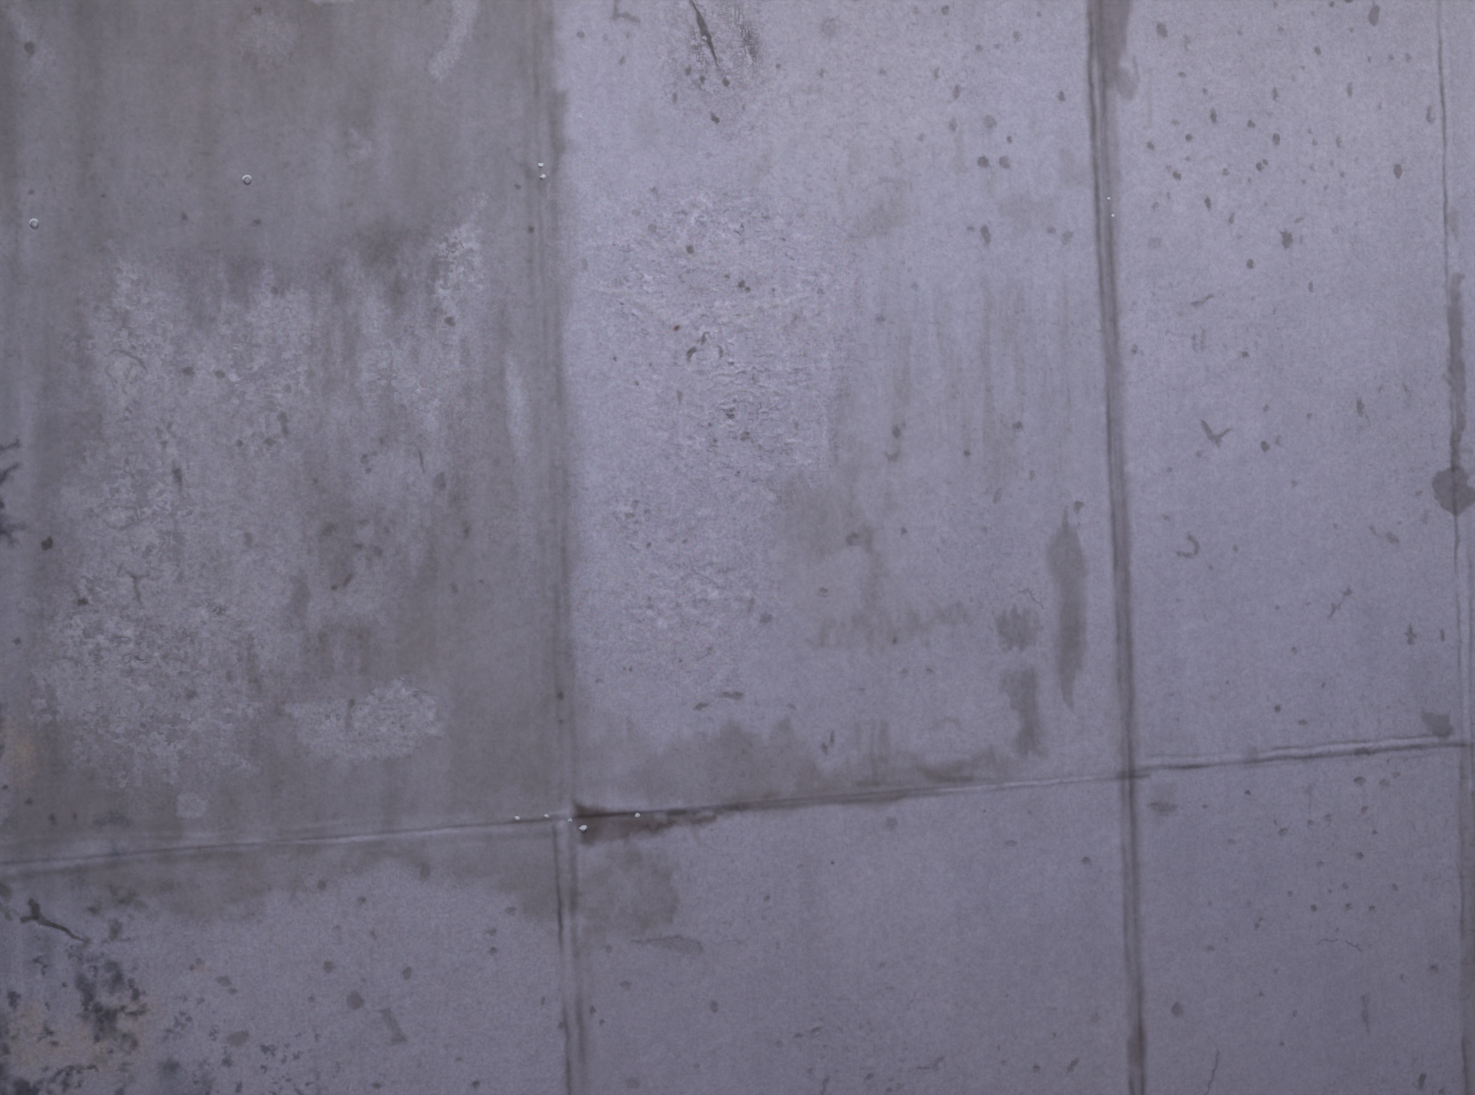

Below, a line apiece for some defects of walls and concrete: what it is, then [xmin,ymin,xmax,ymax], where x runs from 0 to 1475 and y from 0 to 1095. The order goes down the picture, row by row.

leakage [0,0,1096,1095]
leakage [740,0,1205,1095]
leakage [1431,269,1475,518]